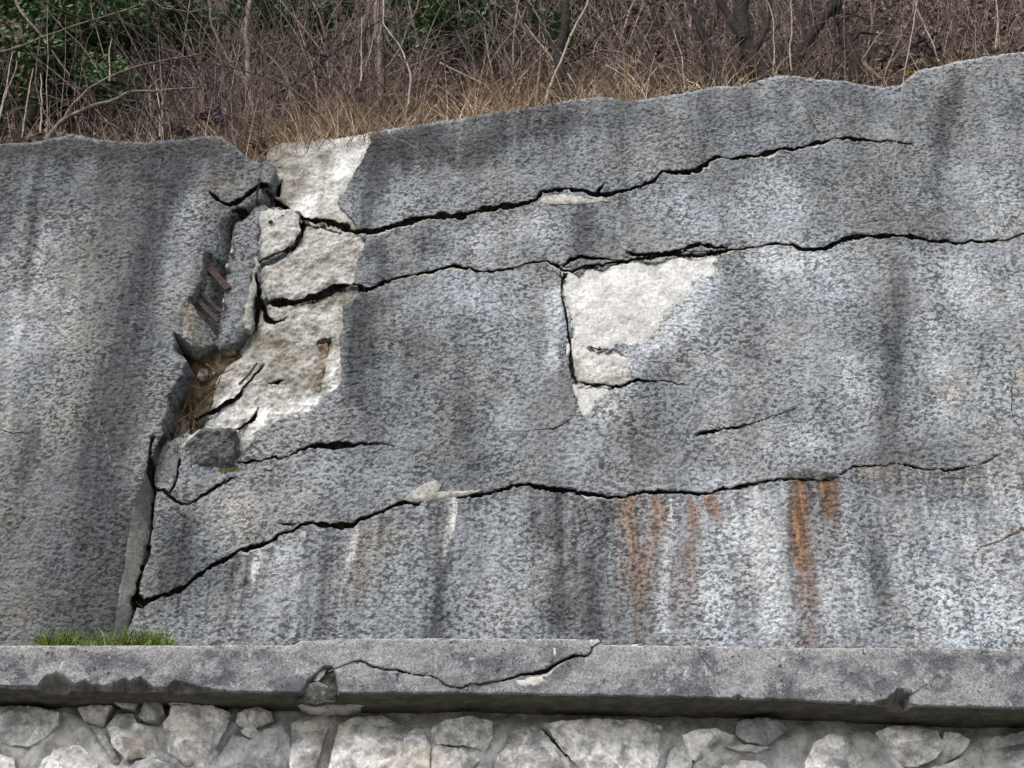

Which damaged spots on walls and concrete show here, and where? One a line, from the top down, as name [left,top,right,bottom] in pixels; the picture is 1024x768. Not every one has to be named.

crack [194,365,283,430]
spalling [170,132,371,457]
rust [315,337,332,392]
crack [209,115,1024,389]
spalling [561,251,719,416]
crack [129,437,421,626]
rust [617,496,664,605]
rust [683,495,722,568]
crack [449,454,1001,502]
rust [790,480,814,610]
rust [818,481,837,518]
crack [328,643,599,688]